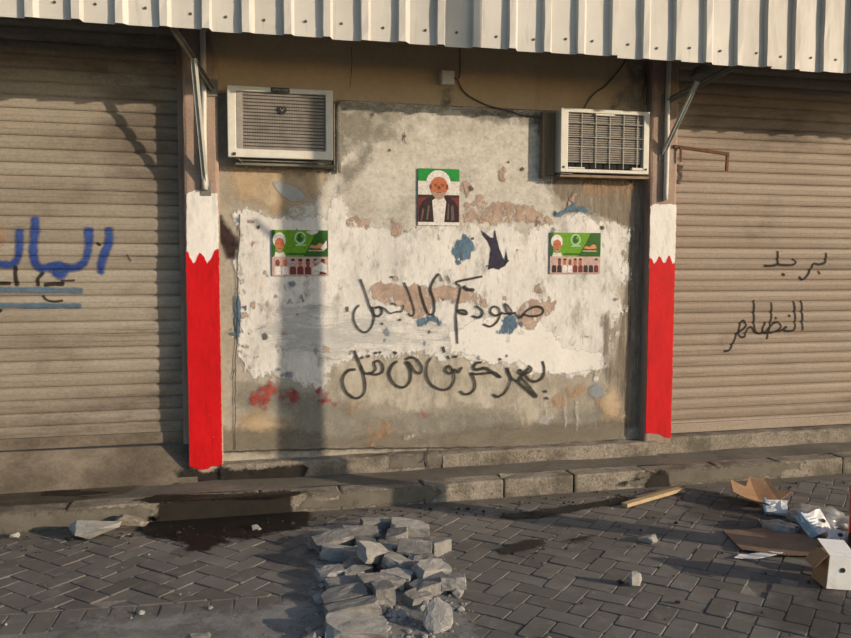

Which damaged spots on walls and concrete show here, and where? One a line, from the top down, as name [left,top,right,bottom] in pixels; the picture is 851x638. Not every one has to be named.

peeling [229,162,332,213]
peeling [346,215,370,230]
peeling [383,220,406,237]
peeling [448,181,557,270]
peeling [370,276,489,345]
peeling [518,284,557,330]
peeling [238,396,293,433]
peeling [599,386,625,419]
water stain [176,464,308,484]
water stain [133,489,312,551]